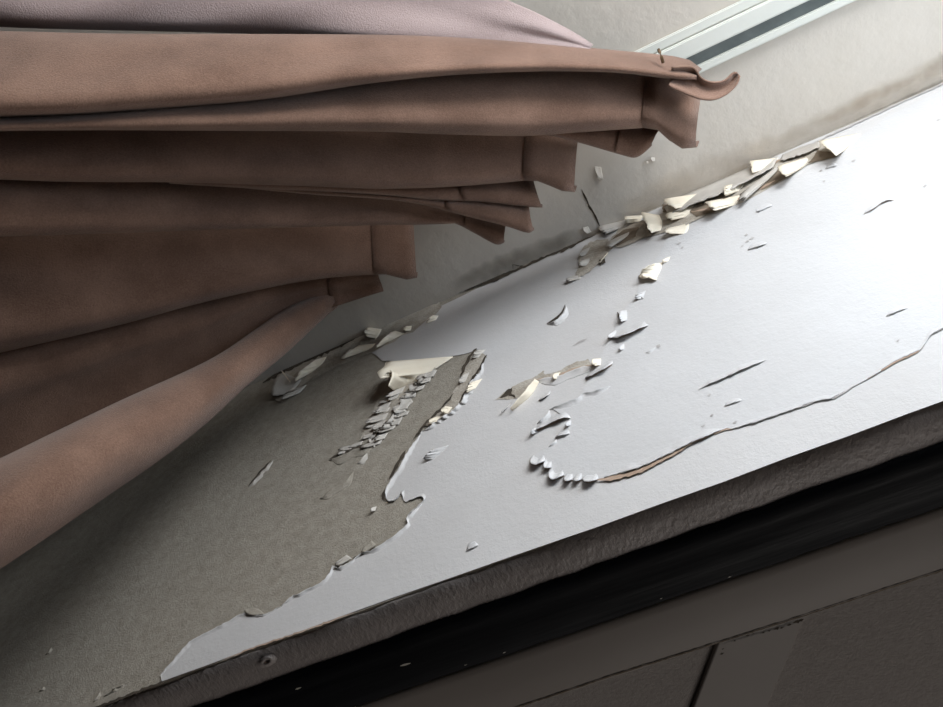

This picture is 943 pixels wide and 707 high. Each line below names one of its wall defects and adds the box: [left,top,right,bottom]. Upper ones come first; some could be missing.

peeling [566,133,861,282]
peeling [263,302,442,403]
peeling [607,310,648,350]
peeling [635,257,670,299]
peeling [496,358,613,483]
peeling [161,348,487,681]